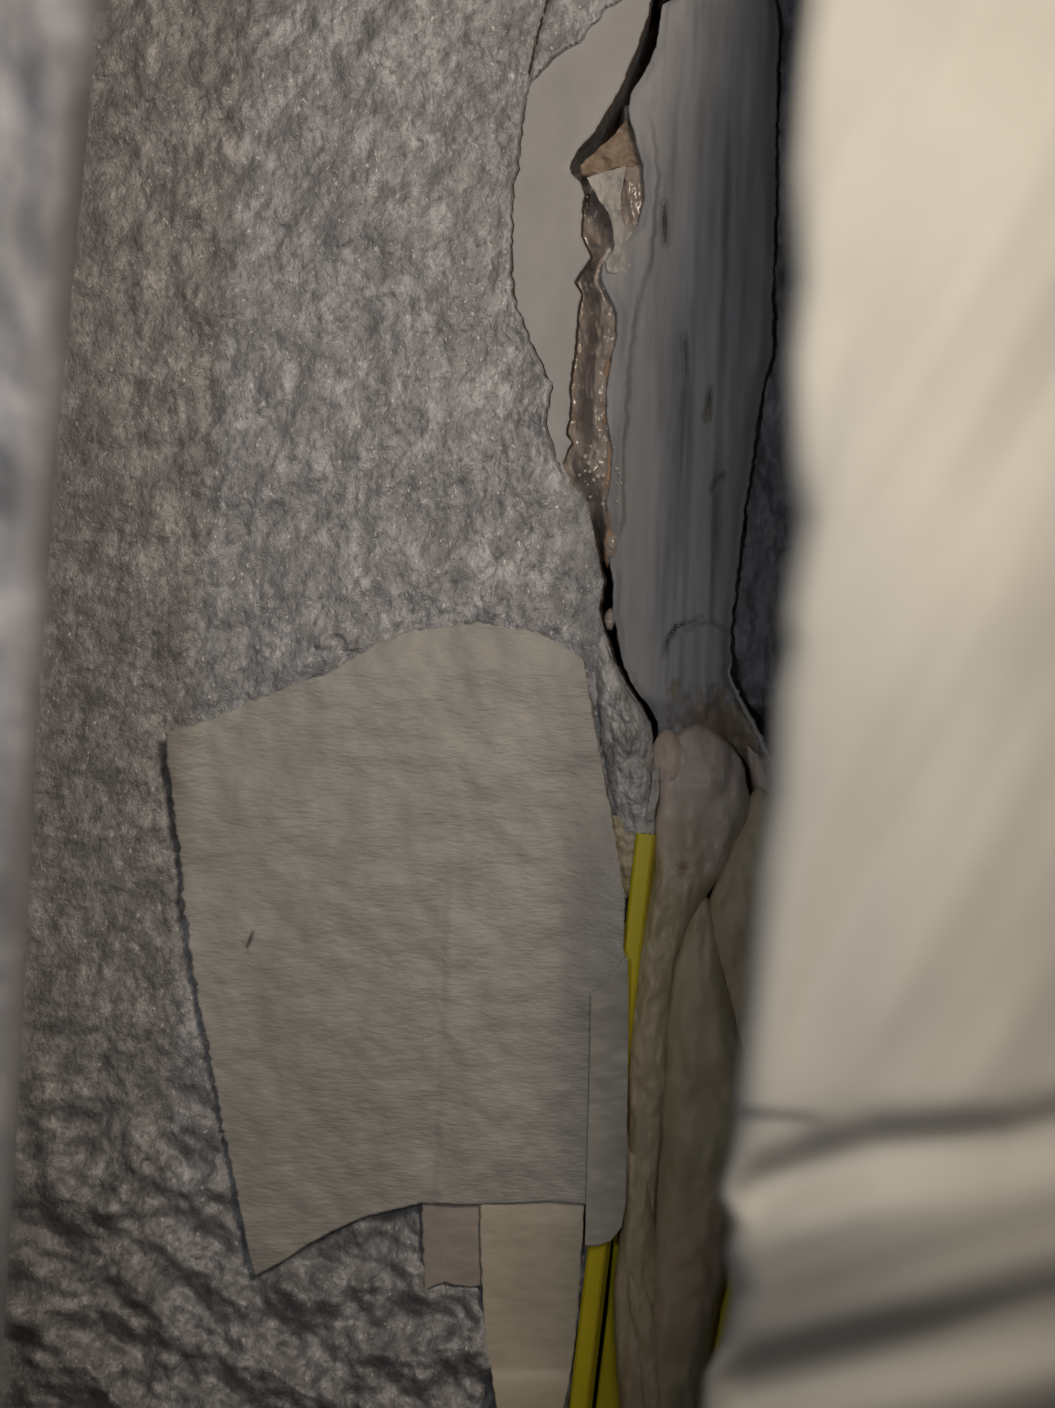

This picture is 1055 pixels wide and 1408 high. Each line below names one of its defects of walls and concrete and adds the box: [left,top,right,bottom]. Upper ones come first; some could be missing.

flaking render [511,0,669,474]